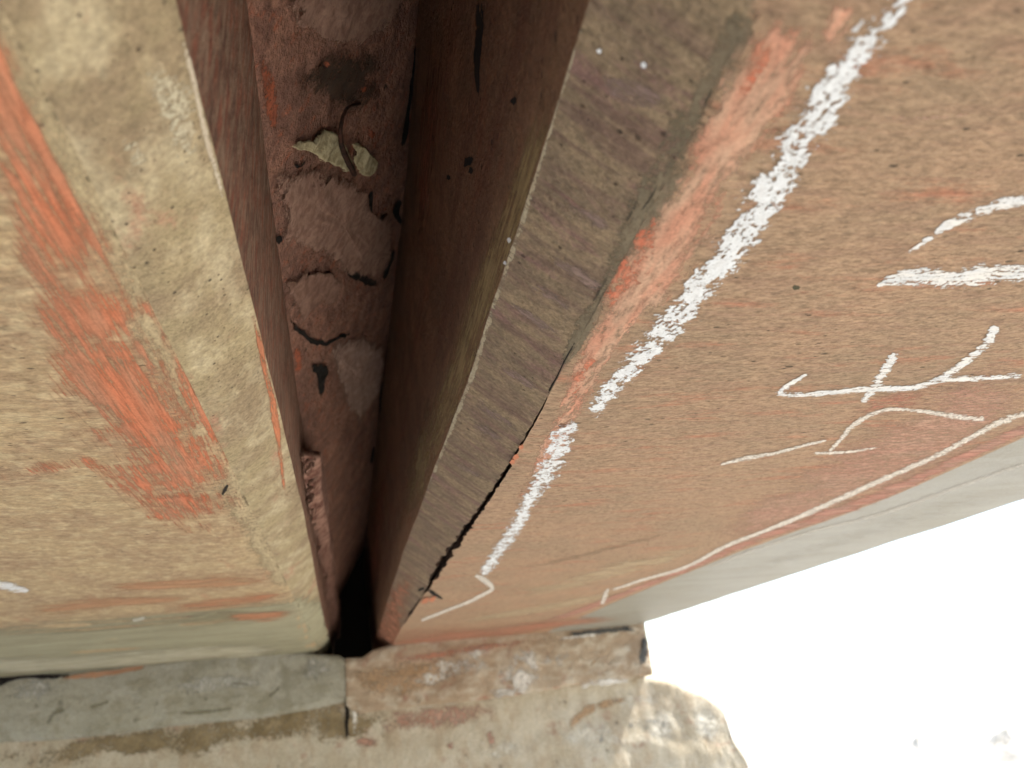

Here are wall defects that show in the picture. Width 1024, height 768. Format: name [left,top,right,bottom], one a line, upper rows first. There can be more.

rust [0,49,234,532]
spalling [276,167,393,322]
spalling [312,336,385,425]
crack [404,343,575,624]